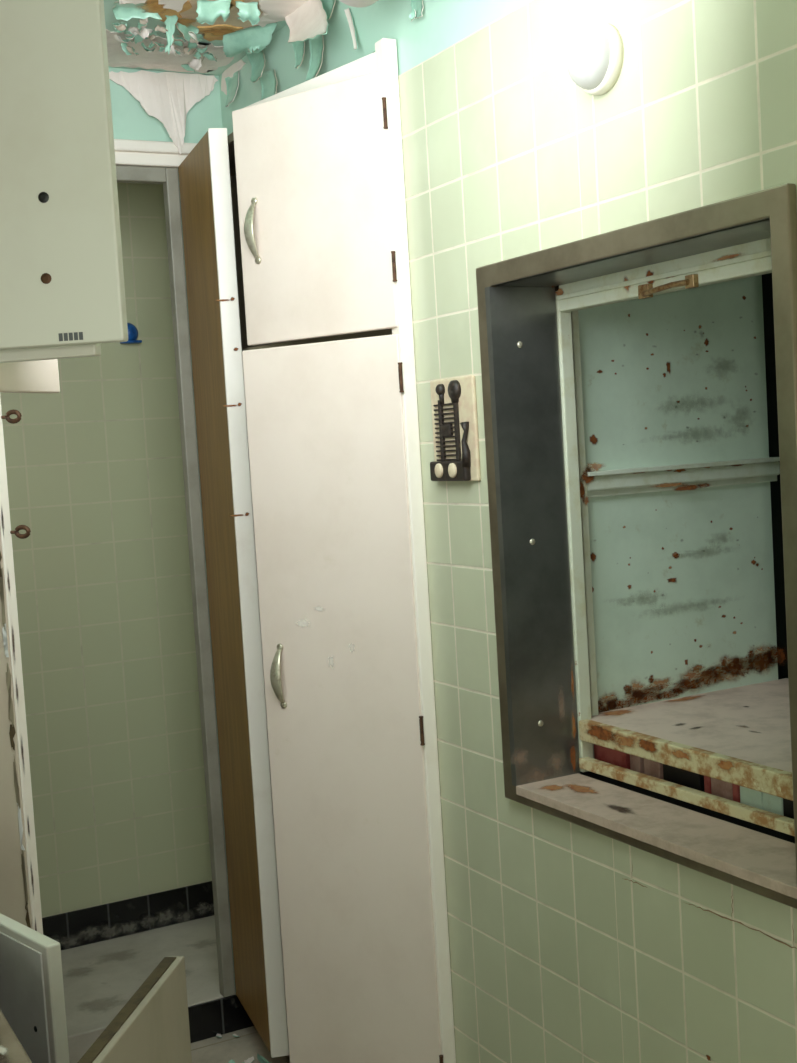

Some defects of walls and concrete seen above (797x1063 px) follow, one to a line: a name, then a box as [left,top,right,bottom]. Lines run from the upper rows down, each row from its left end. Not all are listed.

peeling [106,0,358,155]
rust [580,463,603,505]
rust [655,469,709,491]
rust [570,646,786,771]
rust [541,784,597,793]
crack [686,896,797,949]